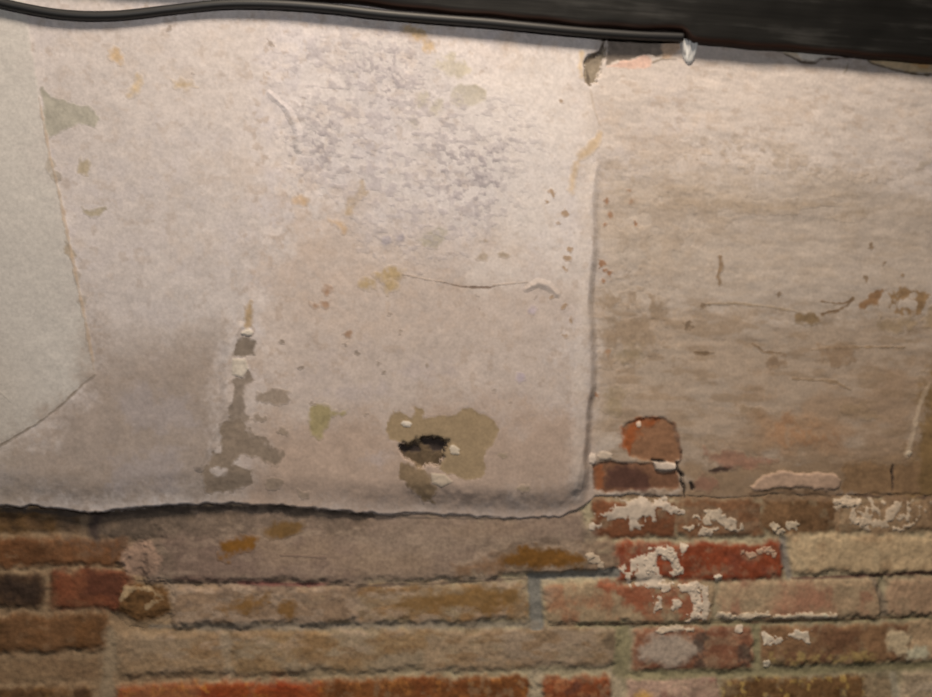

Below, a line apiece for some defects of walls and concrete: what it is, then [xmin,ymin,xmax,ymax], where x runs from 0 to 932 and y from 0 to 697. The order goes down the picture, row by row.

flaking render [576,38,681,88]
flaking render [866,60,932,77]
crack [401,272,529,289]
damp [586,128,932,422]
crack [0,373,97,448]
flaking render [200,299,292,495]
crack [0,504,516,544]
flaking render [385,405,500,507]
crack [649,449,695,498]
flaking render [588,415,932,538]
damp [899,358,932,503]
peeling [618,541,838,647]